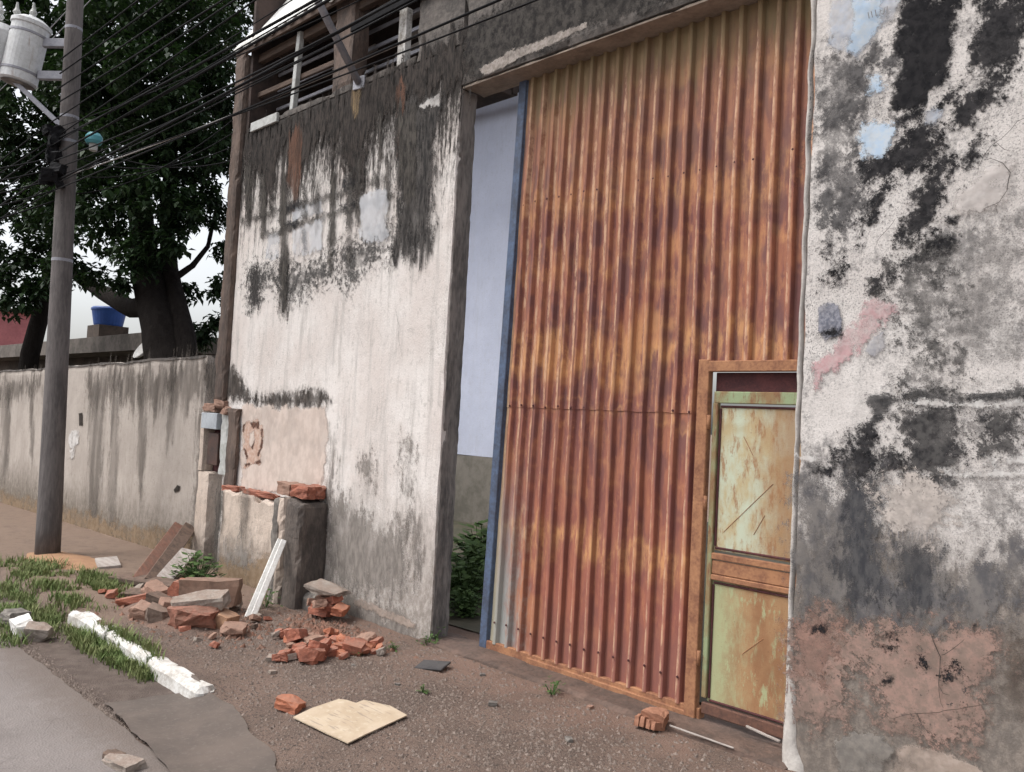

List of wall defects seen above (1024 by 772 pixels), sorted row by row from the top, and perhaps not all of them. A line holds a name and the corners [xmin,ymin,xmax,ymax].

spalling [480,22,587,75]
water stain [238,0,673,324]
peeling [810,299,899,390]
water stain [778,0,1024,698]
water stain [0,365,42,513]
water stain [62,346,332,549]
spalling [242,419,264,469]